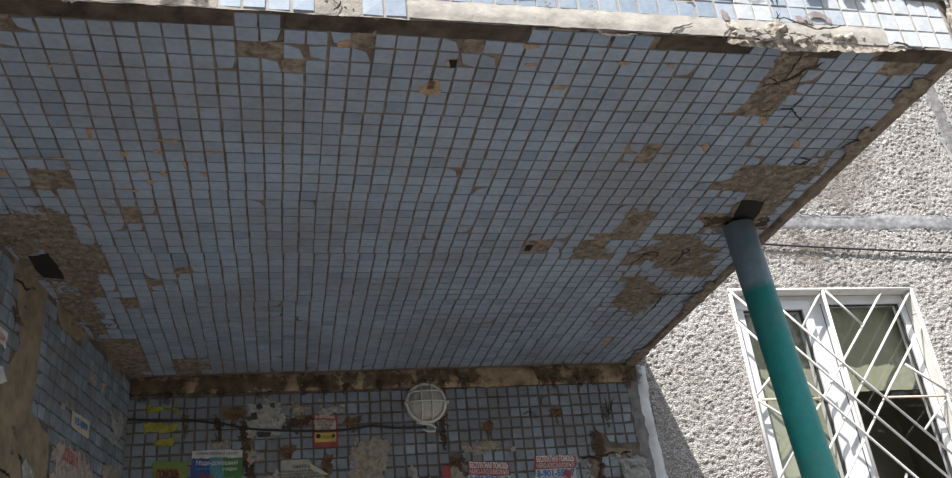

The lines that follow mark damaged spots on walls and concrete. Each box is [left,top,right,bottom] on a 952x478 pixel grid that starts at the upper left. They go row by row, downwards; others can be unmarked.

peeling [314,0,362,16]
crack [771,0,844,30]
peeling [337,18,381,49]
peeling [237,39,308,75]
peeling [407,0,935,125]
crack [758,53,824,89]
crack [776,98,807,128]
peeling [24,157,76,192]
peeling [569,127,877,316]
peeling [0,204,151,478]